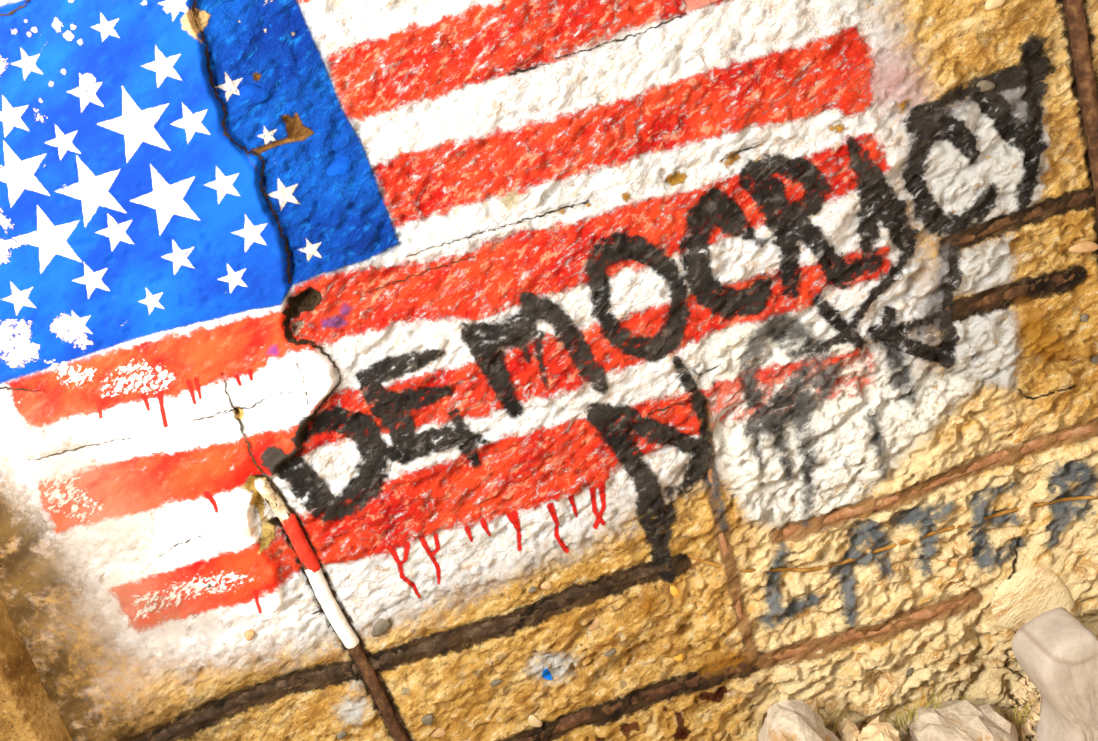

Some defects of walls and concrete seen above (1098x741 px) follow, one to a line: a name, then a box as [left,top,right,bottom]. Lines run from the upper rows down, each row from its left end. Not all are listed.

crack [0,0,30,16]
spalling [163,7,210,42]
spalling [250,113,314,154]
crack [170,0,341,477]
spalling [283,287,322,336]
rust [1022,308,1065,358]
peeling [0,313,175,397]
crack [0,385,46,393]
crack [29,437,132,460]
rust [699,686,728,703]
rust [620,722,640,739]
rust [664,707,691,740]